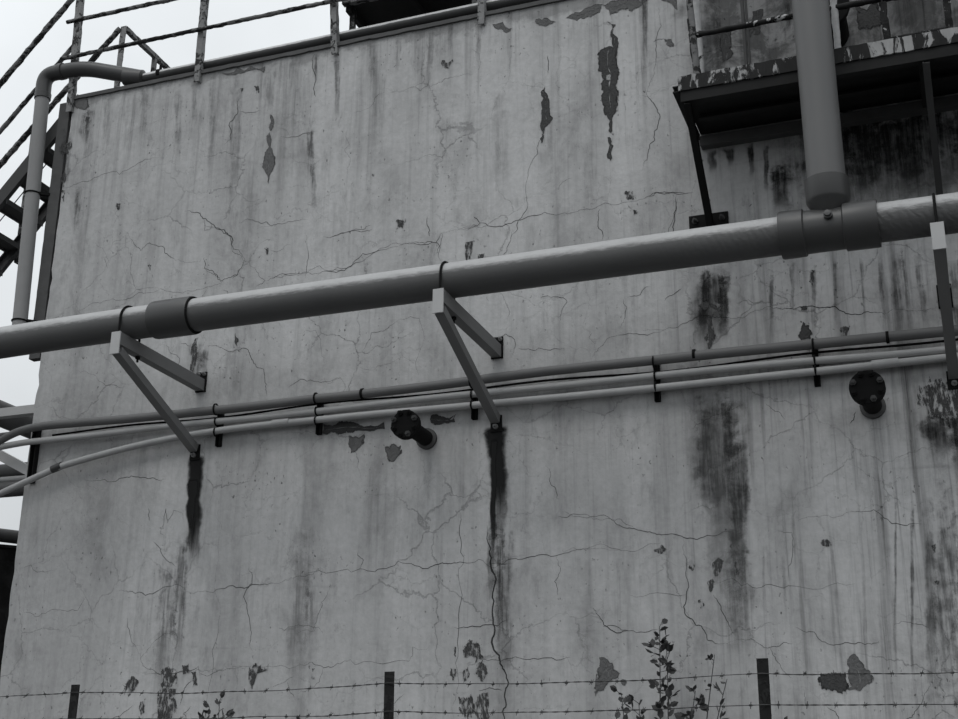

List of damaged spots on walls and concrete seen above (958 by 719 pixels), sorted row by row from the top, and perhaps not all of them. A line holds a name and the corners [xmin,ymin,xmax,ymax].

peeling [262,115,275,184]
peeling [540,87,553,143]
peeling [566,0,642,161]
crack [468,143,692,254]
crack [88,212,443,306]
crack [119,510,422,716]
crack [280,472,919,719]
spalling [157,664,197,718]
spalling [450,640,488,683]
spalling [458,692,489,719]
peeling [594,657,627,696]
peeling [817,654,874,693]